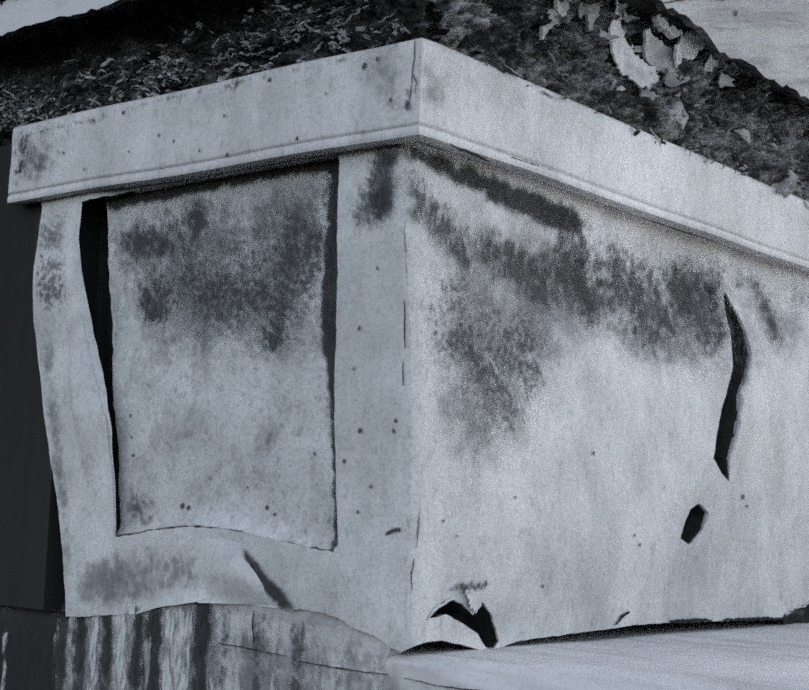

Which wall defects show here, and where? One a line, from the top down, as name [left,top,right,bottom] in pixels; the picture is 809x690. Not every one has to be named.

crack [408,36,417,105]
peeling [539,0,735,101]
leakage [353,144,398,226]
leakage [410,147,731,356]
leakage [737,276,781,341]
leakage [106,159,340,552]
leakage [435,284,545,428]
leakage [0,602,226,690]
leakage [290,625,304,690]